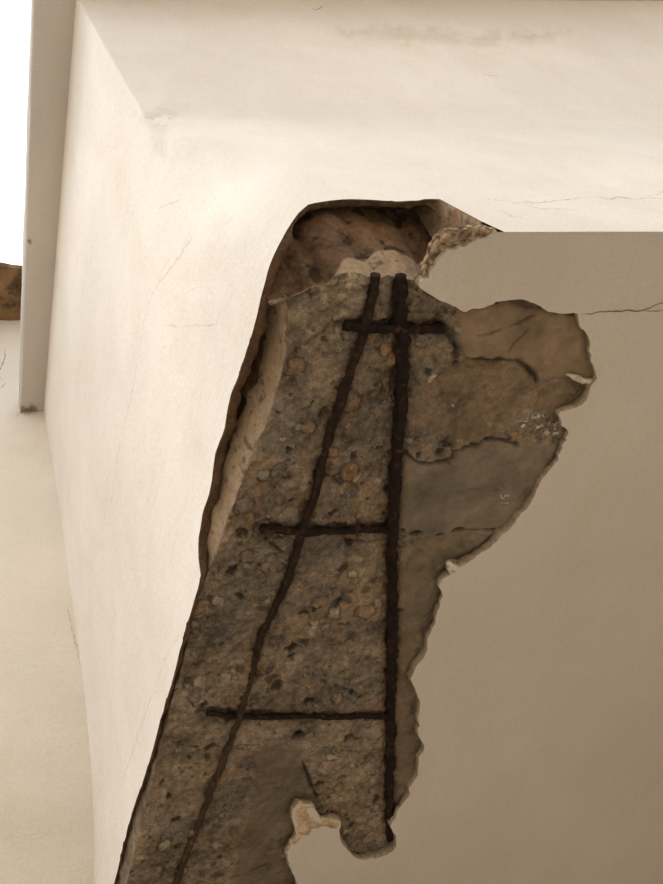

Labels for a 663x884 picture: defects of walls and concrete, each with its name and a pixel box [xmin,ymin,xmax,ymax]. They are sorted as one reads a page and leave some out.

spalling [114,199,597,884]
crack [593,302,663,314]